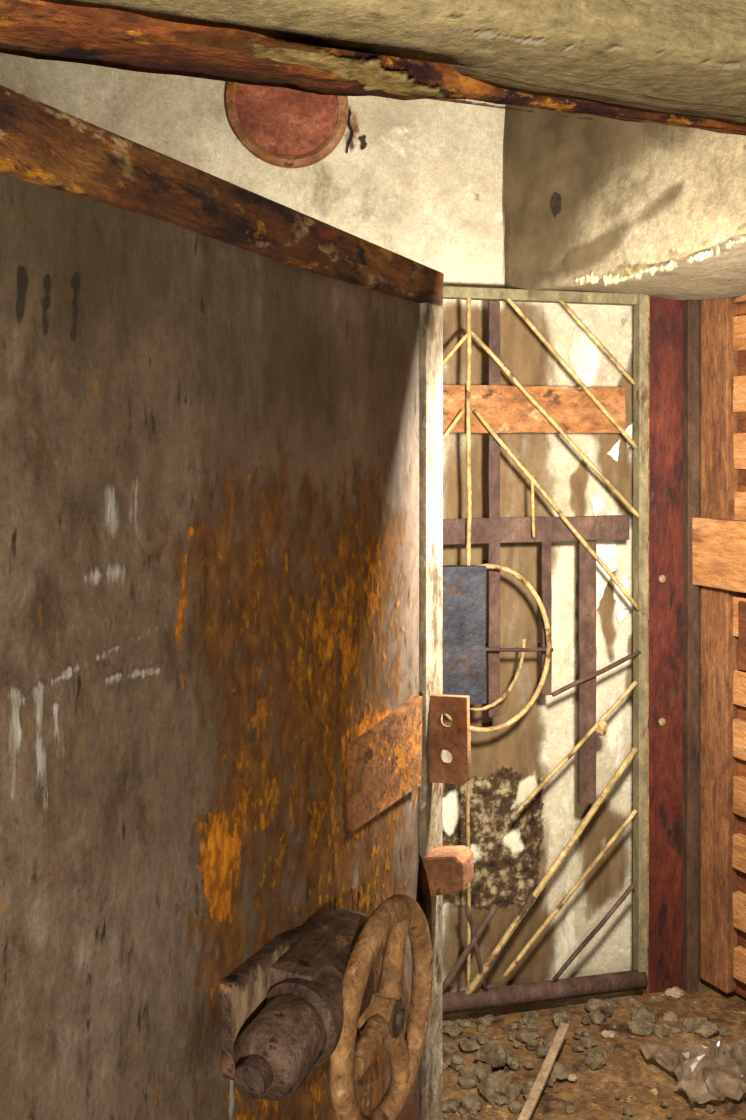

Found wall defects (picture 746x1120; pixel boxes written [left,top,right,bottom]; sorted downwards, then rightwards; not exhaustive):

rust [347,106,359,150]
leakage [443,105,746,386]
leakage [443,433,550,519]
leakage [571,358,633,523]
leakage [598,570,616,660]
rust [174,456,418,1026]
leakage [443,542,556,987]
leakage [578,801,627,911]
rust [221,1057,335,1120]